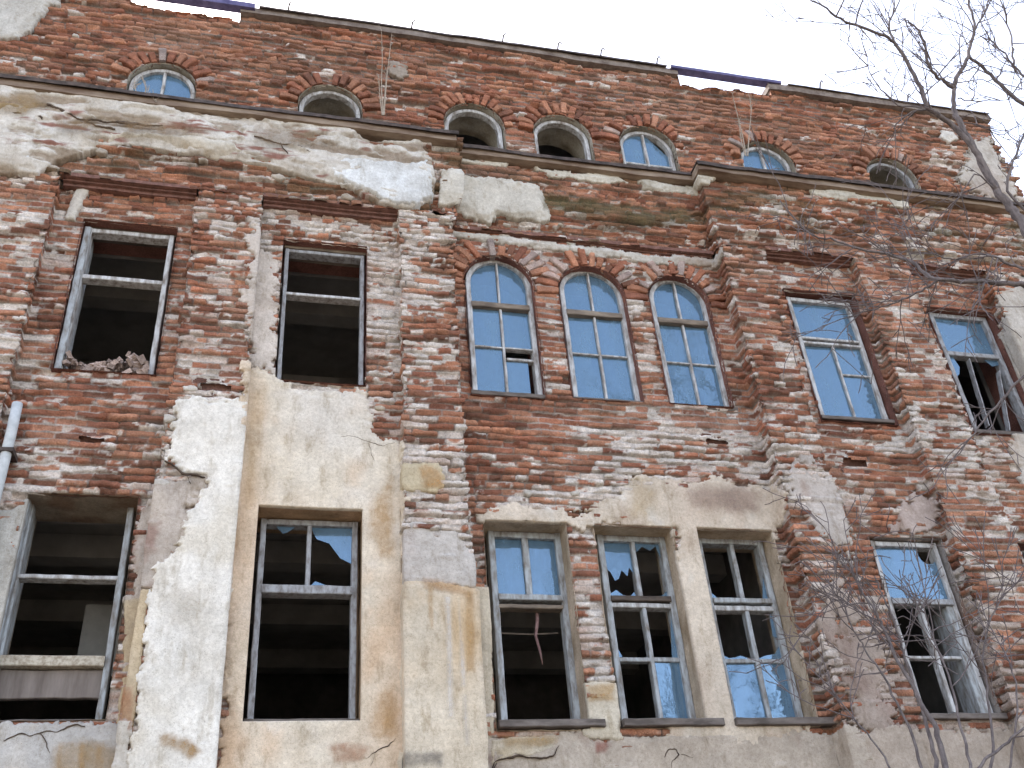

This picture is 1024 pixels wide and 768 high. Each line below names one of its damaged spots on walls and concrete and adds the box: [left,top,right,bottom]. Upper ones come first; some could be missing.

crack [12,103,161,130]
peeling [0,85,724,271]
peeling [0,226,1024,768]
crack [4,724,85,753]
crack [492,746,559,768]